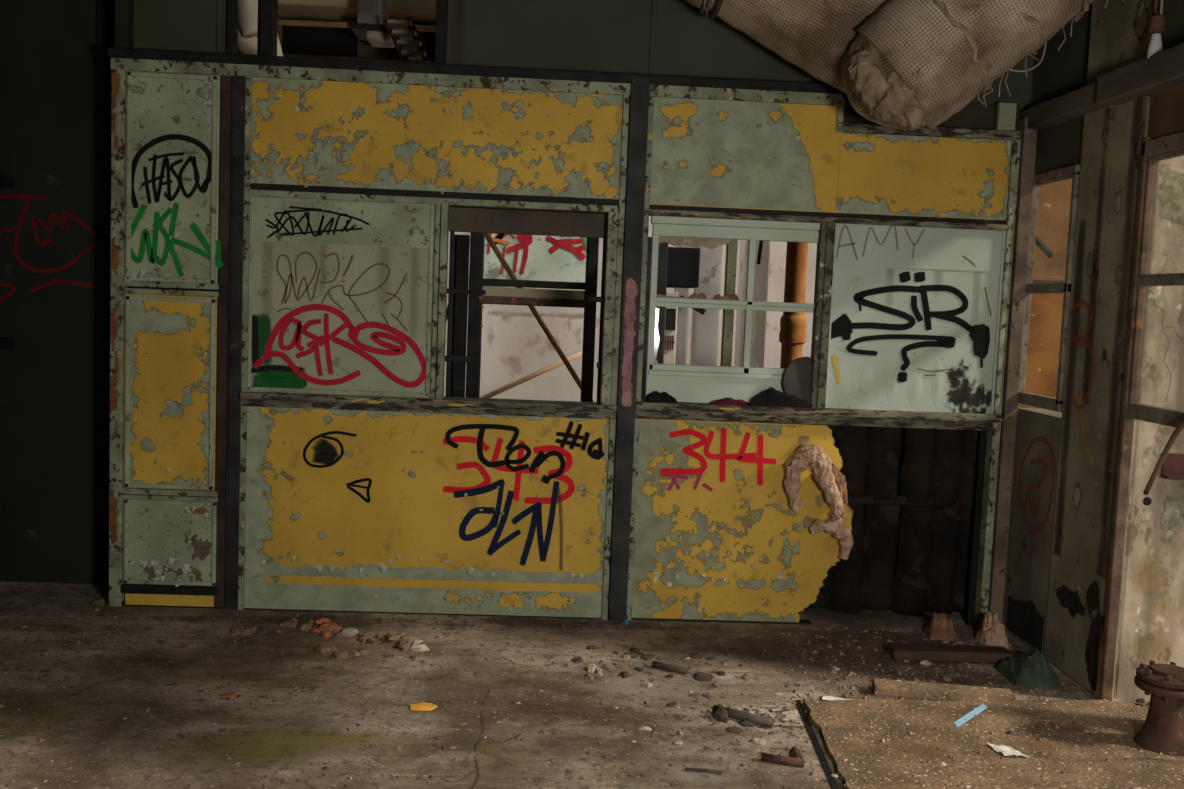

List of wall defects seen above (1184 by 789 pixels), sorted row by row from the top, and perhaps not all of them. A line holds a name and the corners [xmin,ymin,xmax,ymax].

peeling [251,77,623,199]
peeling [650,97,1011,220]
peeling [129,300,211,485]
peeling [244,406,610,618]
peeling [631,420,828,622]
crack [440,690,524,783]